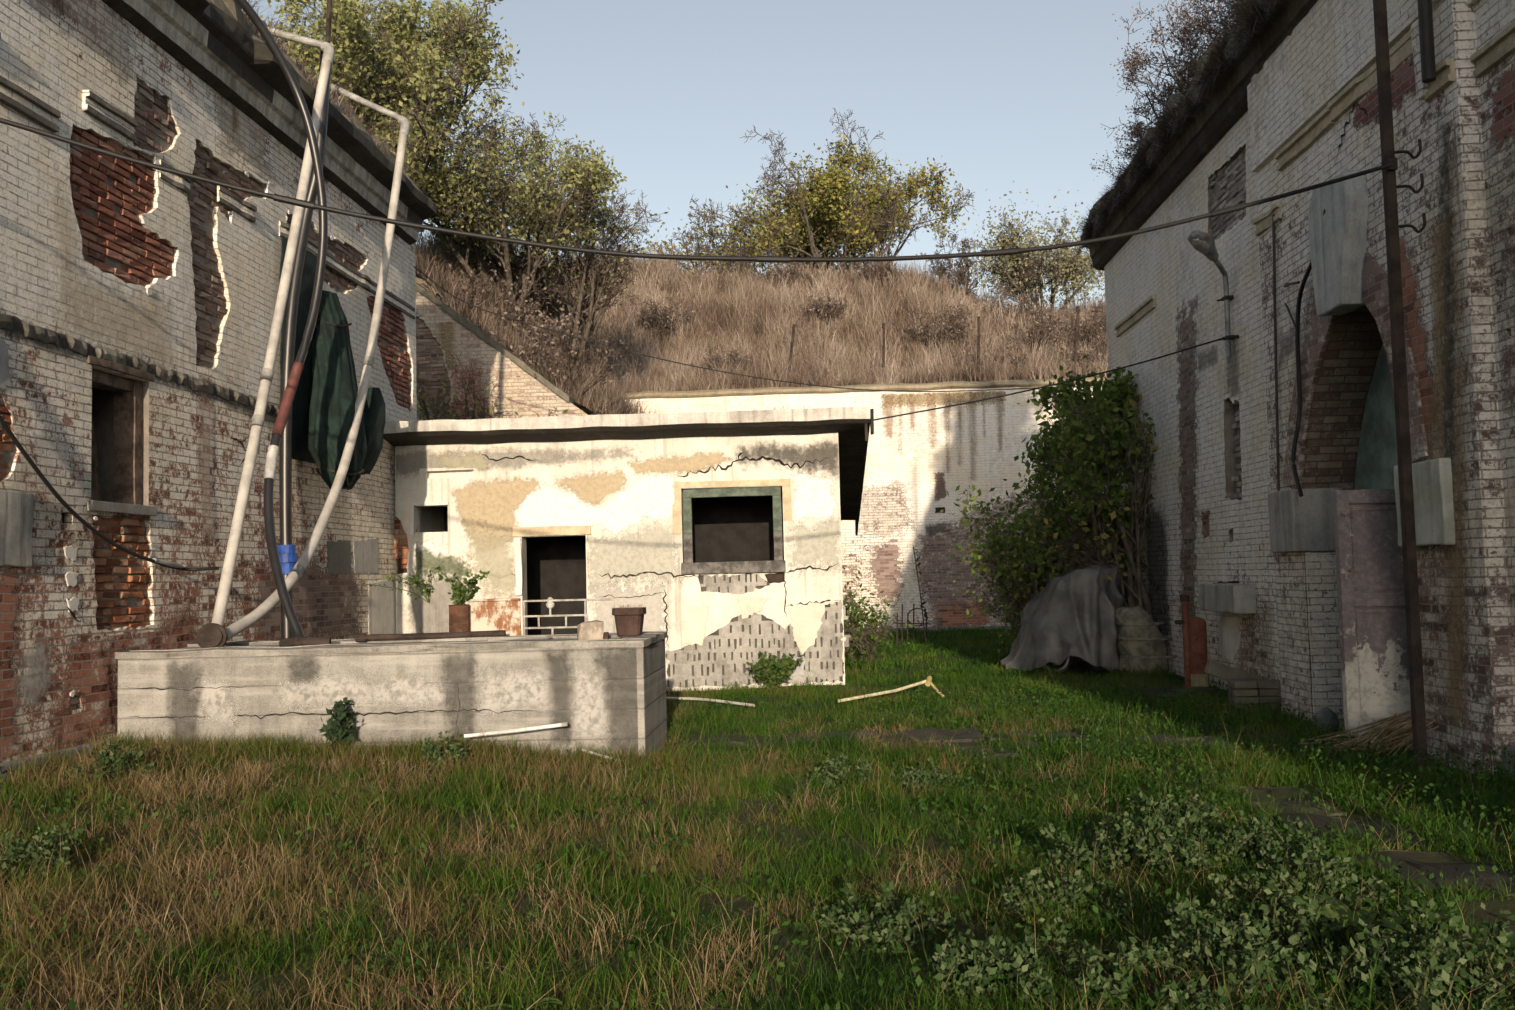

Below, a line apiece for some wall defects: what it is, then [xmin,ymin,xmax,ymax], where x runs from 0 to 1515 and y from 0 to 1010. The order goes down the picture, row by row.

peeling [1352,53,1416,131]
flaking render [16,0,278,369]
peeling [1487,65,1515,427]
flaking render [309,225,496,420]
flaking render [0,400,198,759]
peeling [440,454,540,597]
peeling [557,452,730,504]
crack [680,452,825,477]
peeling [1175,296,1210,636]
flaking render [1223,399,1242,498]
damp [169,667,235,746]